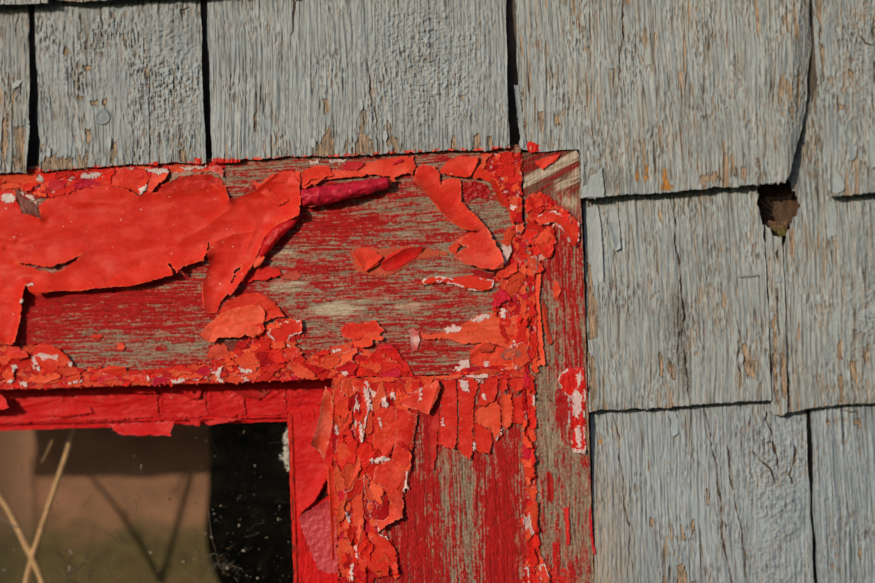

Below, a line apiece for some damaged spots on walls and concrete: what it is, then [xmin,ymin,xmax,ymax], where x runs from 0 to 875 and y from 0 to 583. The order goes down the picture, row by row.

peeling [0,85,621,583]
crack [674,217,747,583]
crack [761,413,796,485]